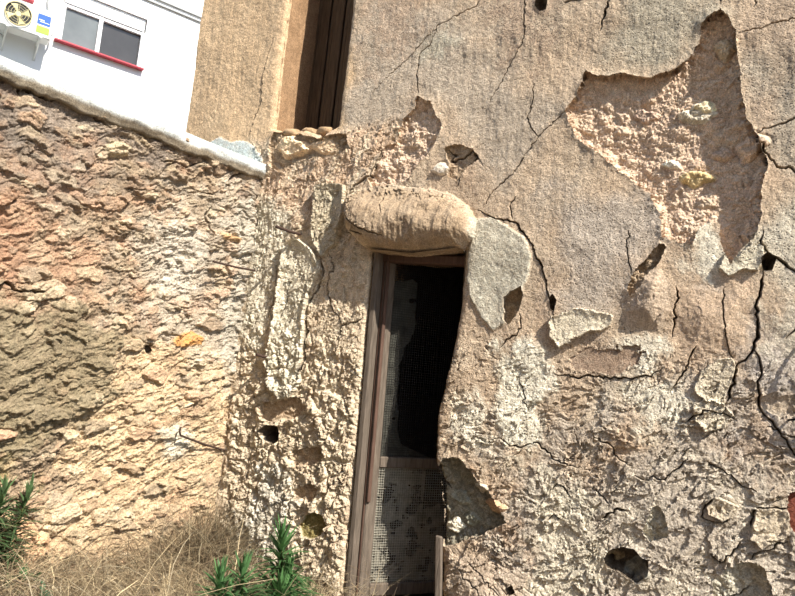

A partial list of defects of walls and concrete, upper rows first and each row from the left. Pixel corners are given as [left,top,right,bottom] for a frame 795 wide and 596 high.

spalling [267,132,350,172]
spalling [367,96,442,186]
spalling [565,8,772,296]
crack [754,116,795,173]
crack [477,83,571,319]
crack [0,280,53,294]
peeling [257,183,347,422]
peeling [548,308,614,349]
crack [553,346,697,393]
crack [684,229,795,457]
spalling [438,457,508,548]
crack [700,460,789,565]